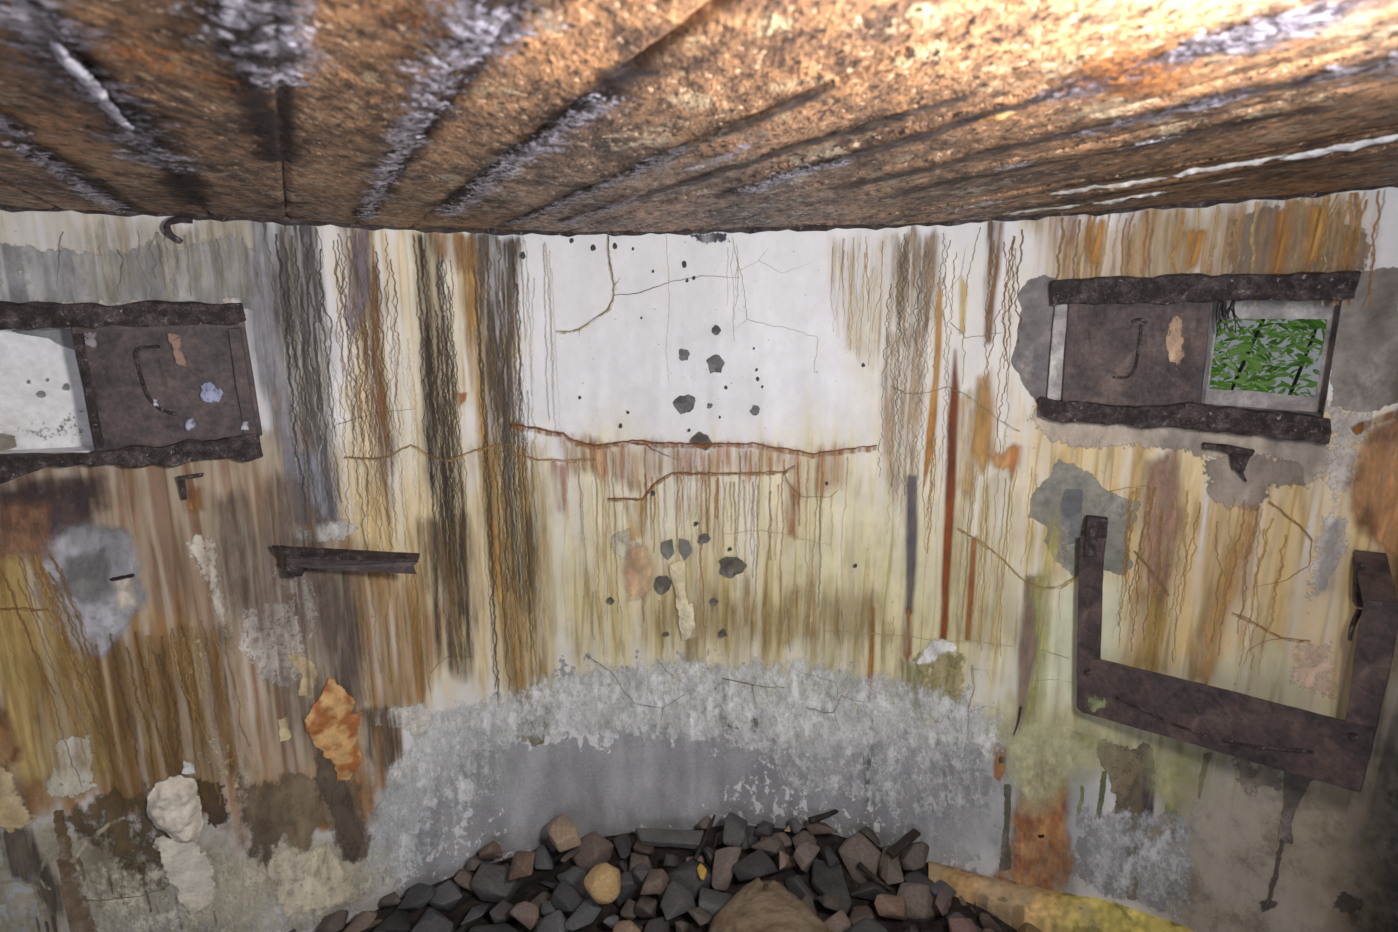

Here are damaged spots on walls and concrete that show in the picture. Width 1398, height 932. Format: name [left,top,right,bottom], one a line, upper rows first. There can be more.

crack [560,235,818,379]
rust [1049,209,1157,280]
rust [1166,316,1184,370]
rust [1171,190,1381,305]
water stain [0,221,555,932]
crack [344,423,877,523]
rust [922,284,1019,640]
peeling [1057,489,1083,545]
rust [1351,411,1398,596]
rust [994,770,1072,890]
water stain [1259,772,1313,912]
water stain [1352,748,1398,932]